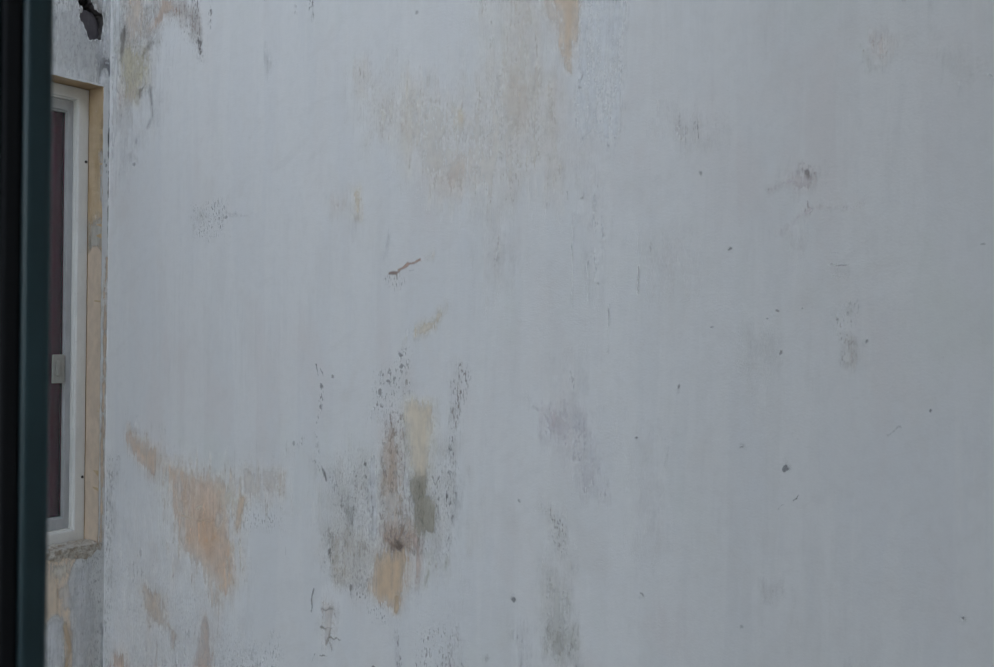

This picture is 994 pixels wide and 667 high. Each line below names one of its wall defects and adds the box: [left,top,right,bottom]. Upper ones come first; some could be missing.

hole [78,0,103,40]
water stain [355,415,456,567]
peeling [46,539,102,667]